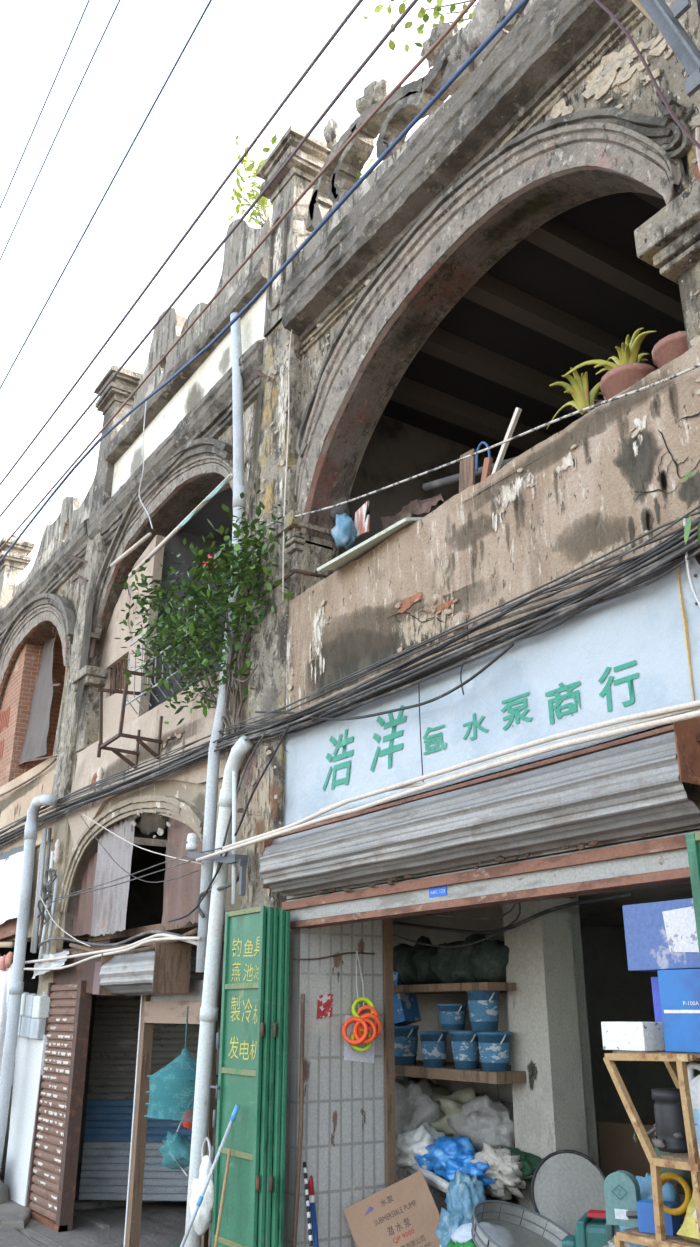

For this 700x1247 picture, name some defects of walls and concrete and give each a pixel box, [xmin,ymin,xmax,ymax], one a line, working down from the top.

peeling [550,98,575,118]
peeling [582,31,673,109]
peeling [243,341,290,542]
peeling [492,468,535,531]
water stain [308,384,700,715]
peeling [309,599,330,683]
peeling [392,558,459,653]